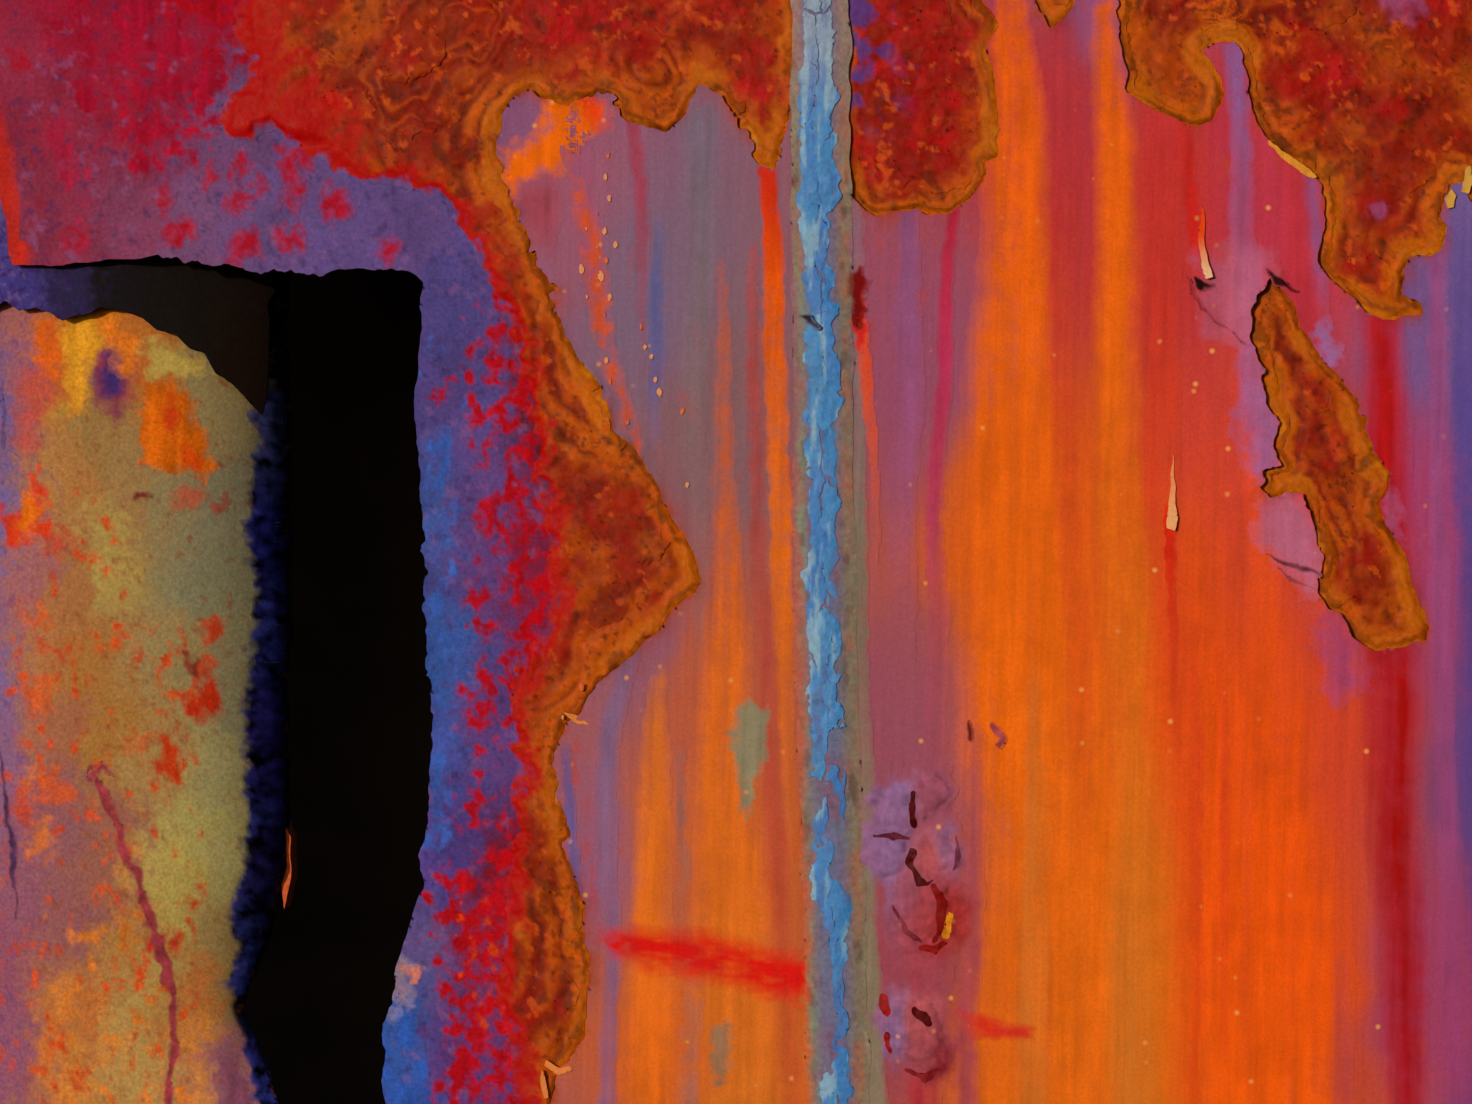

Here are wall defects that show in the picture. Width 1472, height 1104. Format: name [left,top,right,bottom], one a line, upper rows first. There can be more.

peeling [0,131,494,803]
peeling [234,1020,278,1104]
peeling [239,380,292,994]
corrosion [0,0,807,1104]
peeling [381,833,470,1099]
corrosion [848,0,1472,1104]